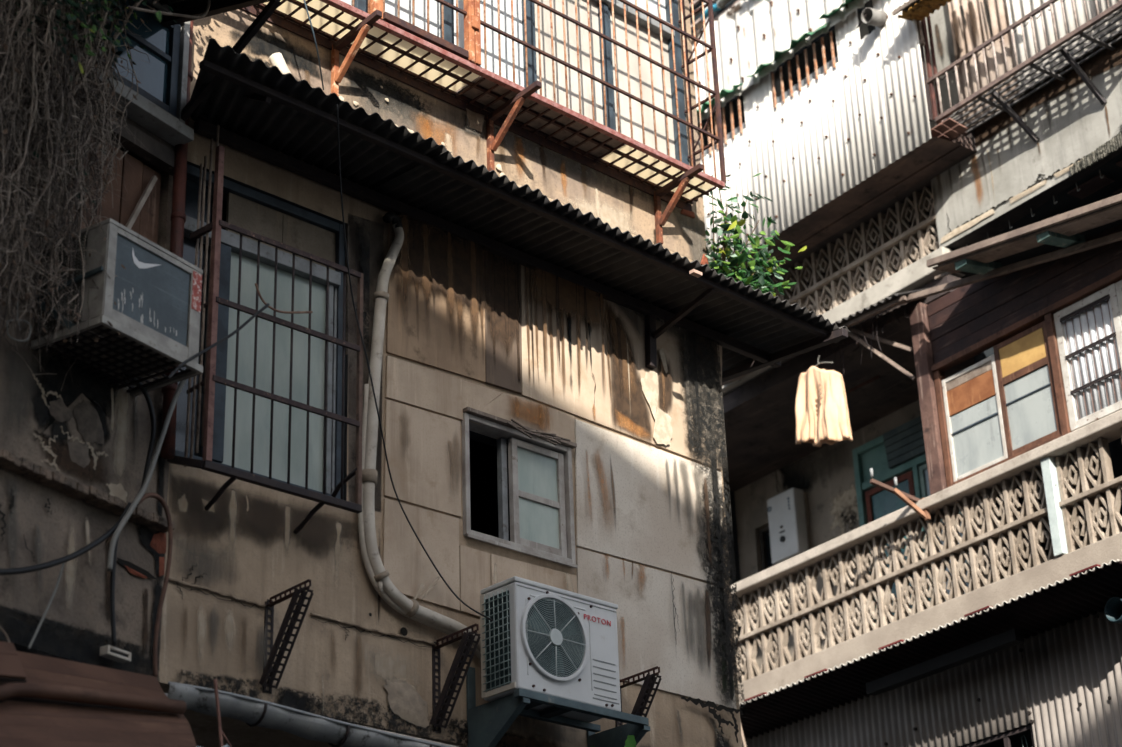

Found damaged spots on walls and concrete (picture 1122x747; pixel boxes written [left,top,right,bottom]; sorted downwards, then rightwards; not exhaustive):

mould [232,30,320,83]
water stain [346,69,432,129]
peeling [32,374,63,406]
peeling [606,303,673,445]
peeling [33,426,109,473]
water stain [158,450,349,582]
water stain [394,212,745,708]
rust [586,451,616,516]
water stain [66,520,90,591]
water stain [184,610,267,666]
water stain [177,670,261,699]
water stain [276,636,433,738]